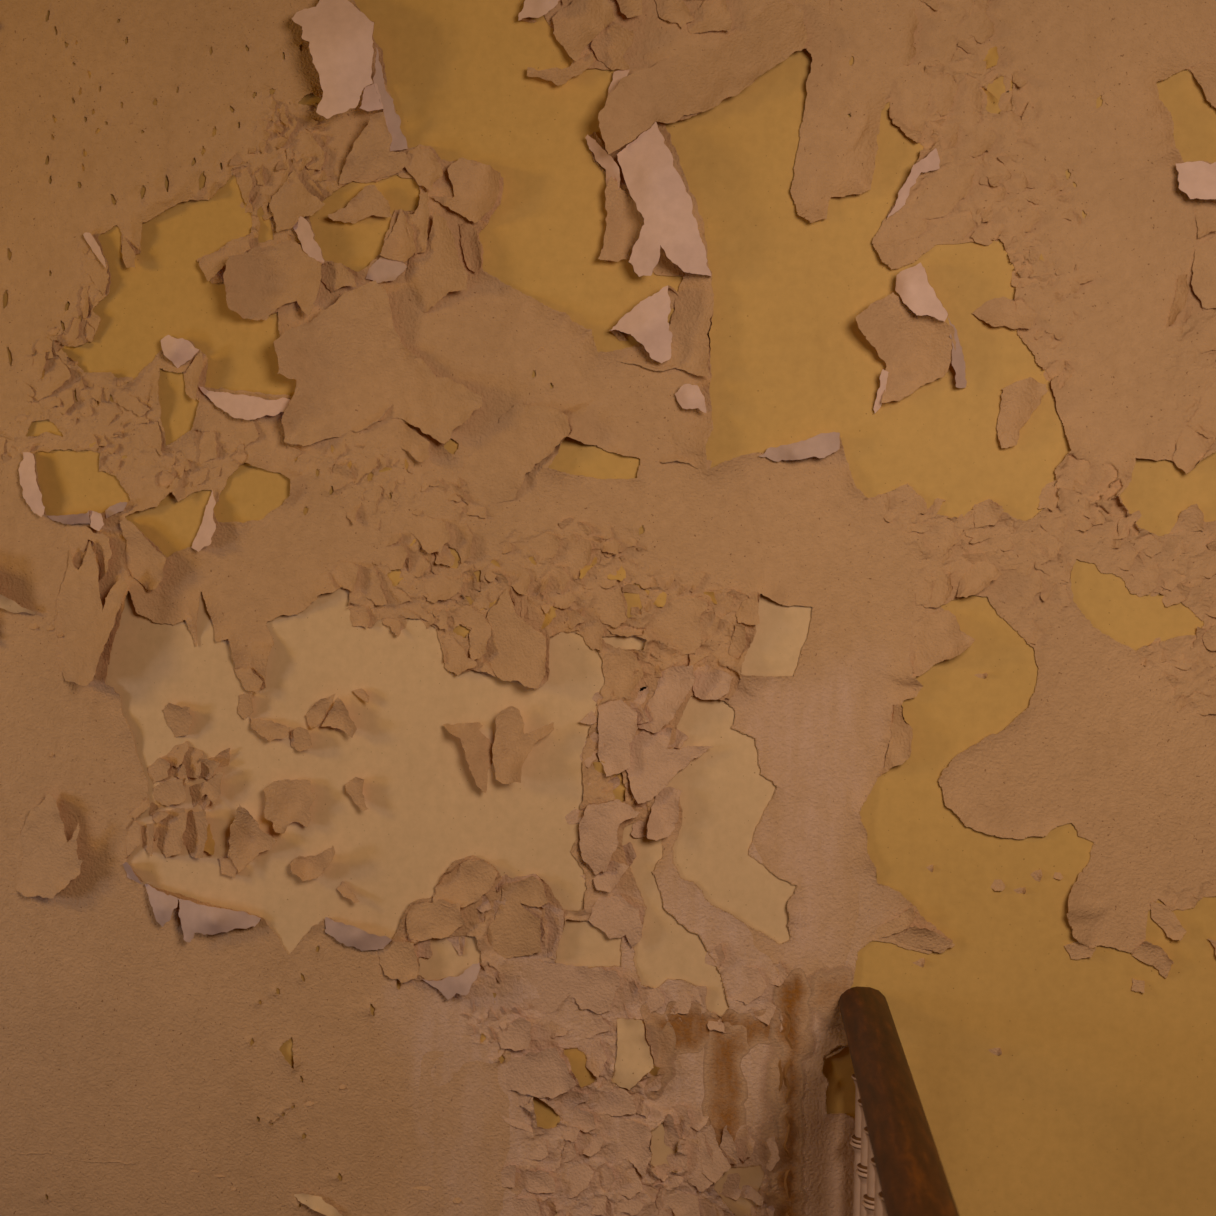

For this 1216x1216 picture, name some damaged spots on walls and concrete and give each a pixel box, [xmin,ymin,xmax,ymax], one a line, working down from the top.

peeling [1145,61,1216,353]
peeling [0,419,813,1216]